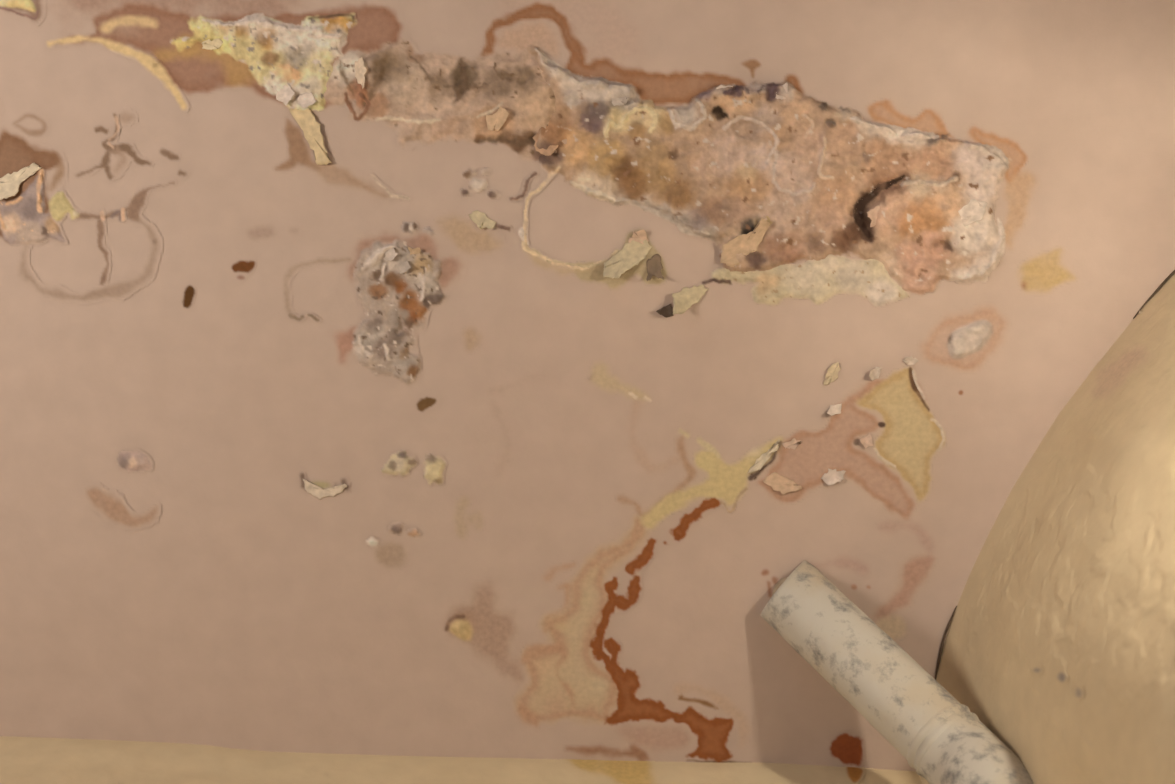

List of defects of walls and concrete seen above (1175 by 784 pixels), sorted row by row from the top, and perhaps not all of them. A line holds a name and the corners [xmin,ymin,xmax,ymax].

spalling [0,0,47,26]
damp [10,111,51,139]
peeling [0,124,82,247]
crack [72,108,190,284]
damp [44,0,408,113]
spalling [169,10,412,203]
damp [480,0,764,105]
spalling [329,42,1013,386]
peeling [749,301,1013,525]
damp [437,358,785,784]
rust [588,496,753,763]
rust [828,731,866,784]